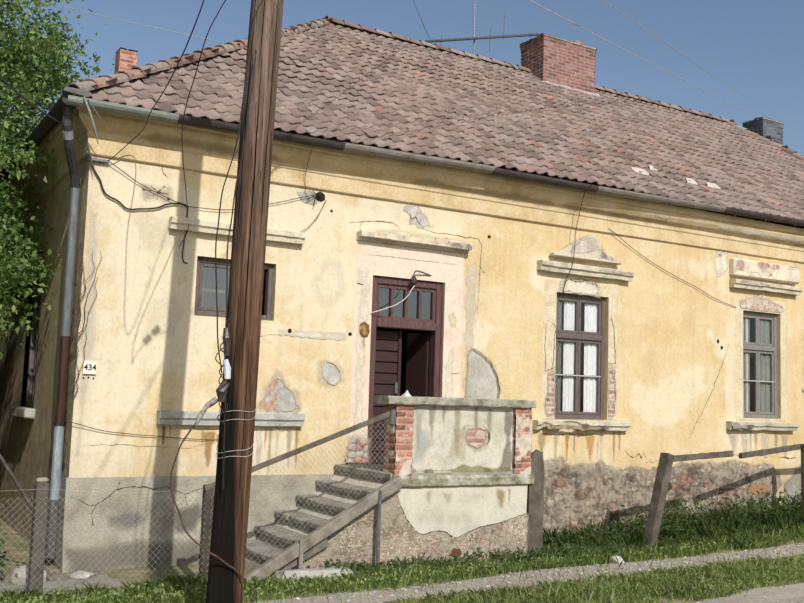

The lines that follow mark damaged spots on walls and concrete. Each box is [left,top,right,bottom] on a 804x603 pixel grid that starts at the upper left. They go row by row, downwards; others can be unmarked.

crack [91,0,337,557]
crack [351,212,484,314]
spalling [449,264,500,399]
peeling [715,252,799,285]
spalling [740,296,783,313]
spalling [256,372,300,413]
spalling [545,365,615,431]
damp [257,428,298,464]
crack [70,482,203,526]
spalling [295,492,529,569]
flaking render [543,456,658,535]
flaking render [663,460,783,519]